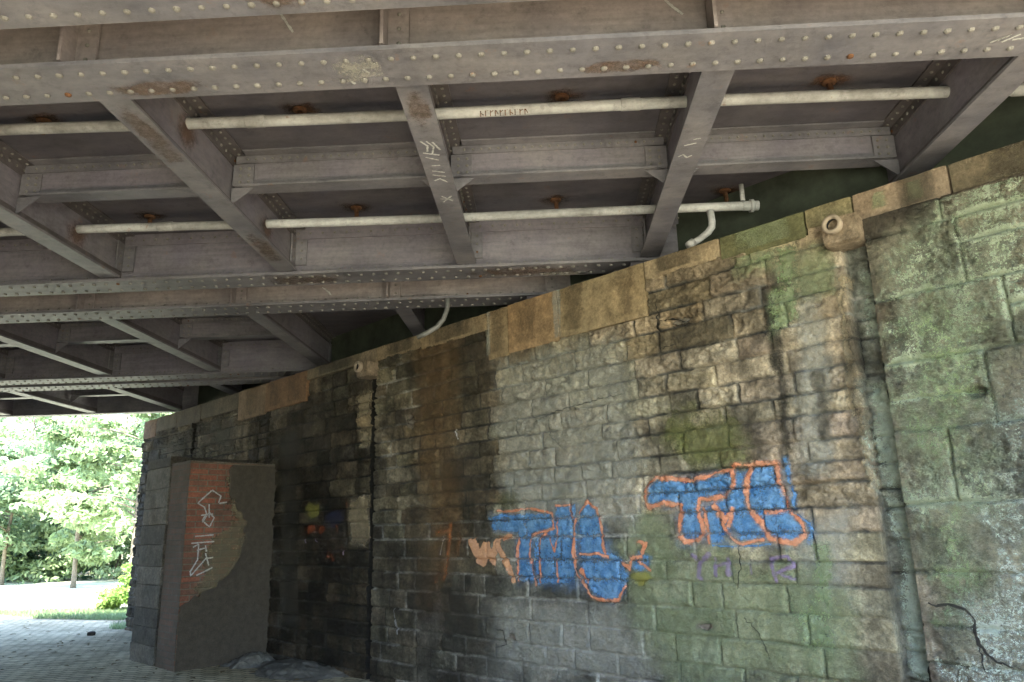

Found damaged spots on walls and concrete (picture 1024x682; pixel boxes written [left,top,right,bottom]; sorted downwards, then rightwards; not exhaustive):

peeling [174,465,278,672]
crack [928,602,1013,673]